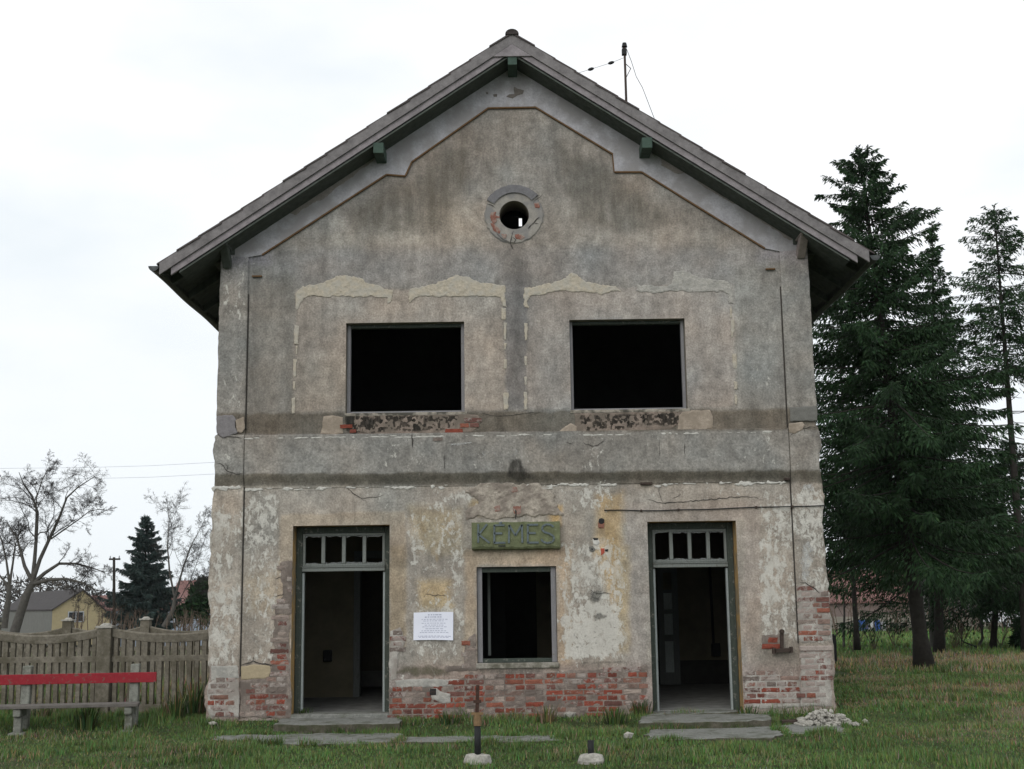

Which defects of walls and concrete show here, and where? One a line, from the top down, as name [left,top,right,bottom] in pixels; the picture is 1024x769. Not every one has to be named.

flaking render [295,275,393,310]
flaking render [523,273,621,308]
peeling [279,414,482,441]
peeling [497,410,713,437]
peeling [465,482,617,521]
crack [648,493,757,504]
peeling [655,480,786,488]
spalling [589,518,608,555]
flaking render [207,560,293,719]
flaking render [743,544,833,709]
flaking render [387,627,648,719]